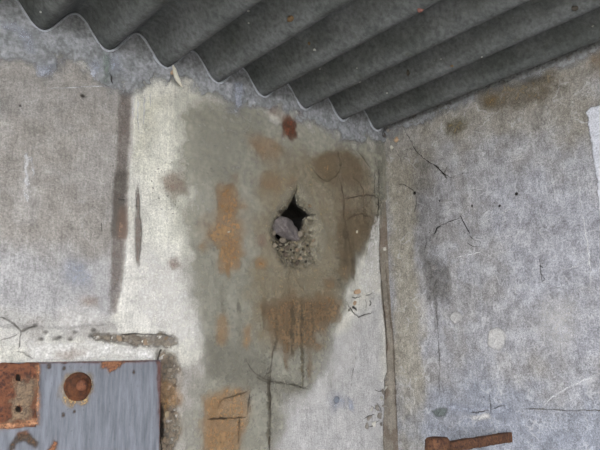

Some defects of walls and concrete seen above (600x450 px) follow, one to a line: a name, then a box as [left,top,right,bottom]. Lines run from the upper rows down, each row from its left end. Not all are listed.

rust [272,109,296,140]
crack [405,131,463,178]
rust [208,188,241,272]
leakage [151,83,382,450]
spalling [269,183,324,270]
crack [313,152,380,254]
rust [264,294,339,360]
spalling [89,329,181,450]
rust [205,389,246,450]
crack [245,343,307,450]